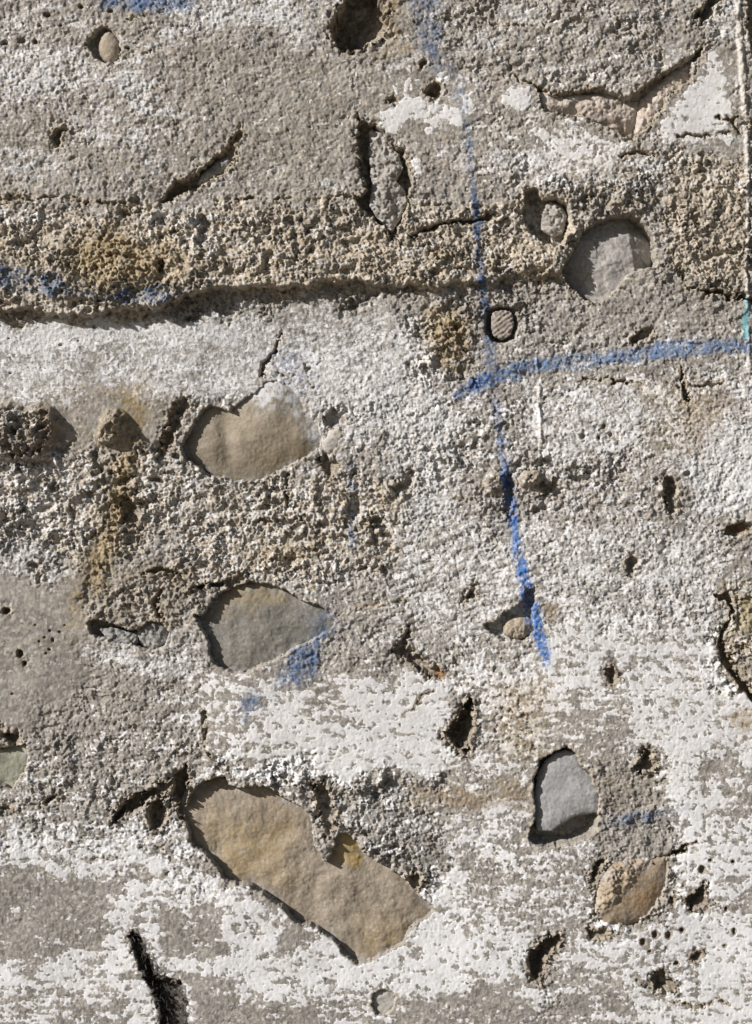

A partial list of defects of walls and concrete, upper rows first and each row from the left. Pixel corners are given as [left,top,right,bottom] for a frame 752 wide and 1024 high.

crack [508,72,536,88]
crack [257,330,315,389]